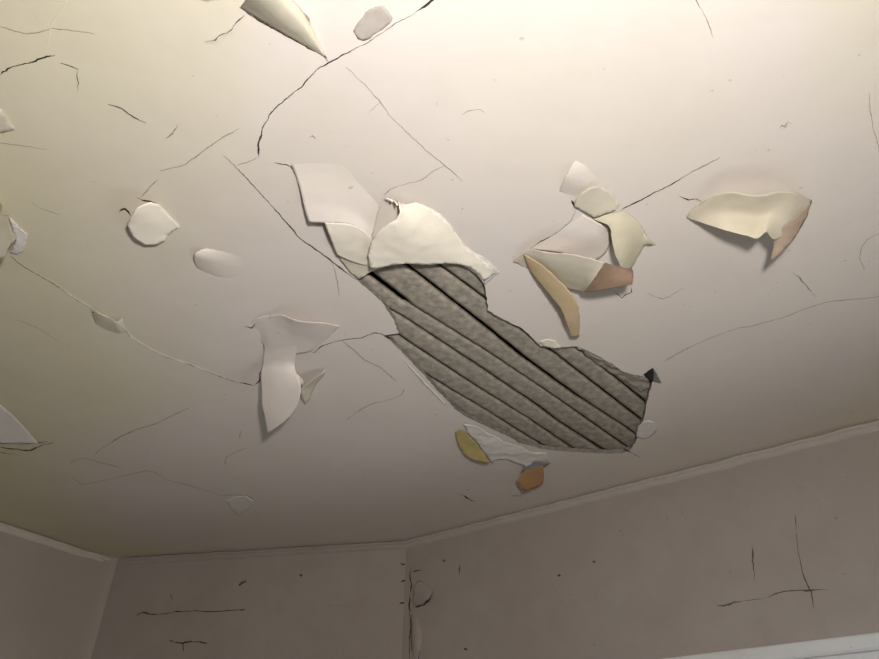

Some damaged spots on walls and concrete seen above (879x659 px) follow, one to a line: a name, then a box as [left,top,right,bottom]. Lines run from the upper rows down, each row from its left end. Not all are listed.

crack [0,55,79,86]
crack [3,26,93,34]
peeling [353,6,393,41]
crack [119,0,459,291]
crack [622,157,720,210]
crack [11,256,261,386]
crack [314,332,404,419]
spalling [361,253,661,450]
crack [664,275,873,362]
crack [2,441,54,454]
crack [718,517,826,608]
crack [399,563,433,659]